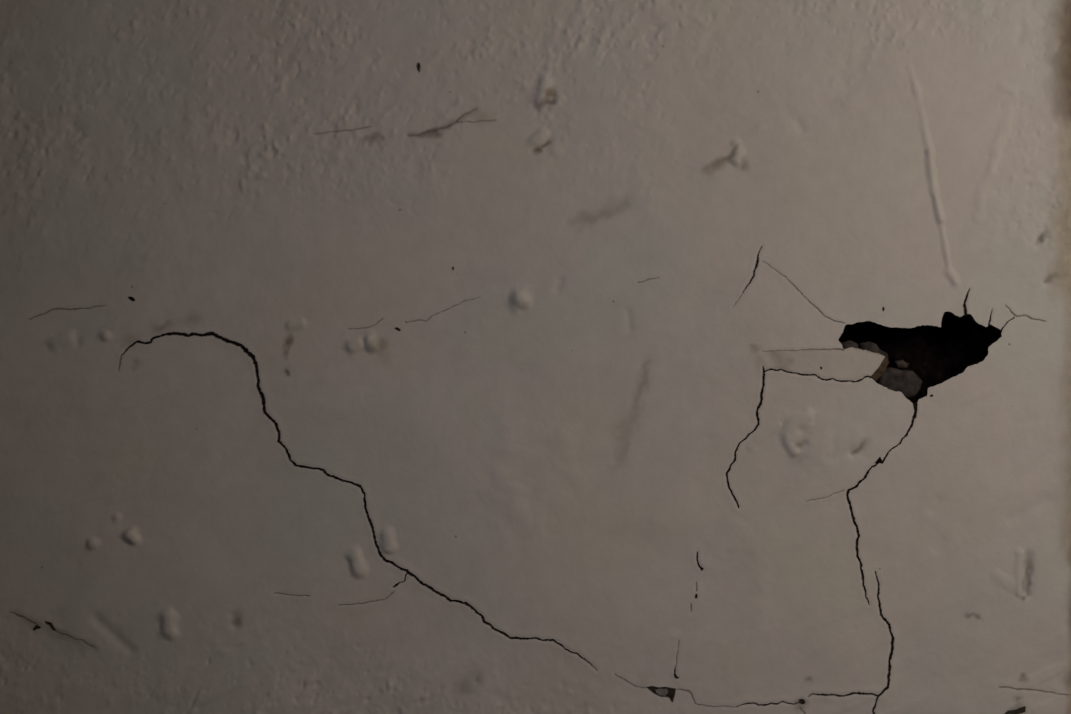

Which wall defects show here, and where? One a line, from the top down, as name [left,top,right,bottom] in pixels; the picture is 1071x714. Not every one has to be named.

crack [726,247,871,508]
flaking render [839,312,1002,403]
crack [963,289,1045,332]
crack [119,332,646,688]
crack [674,402,918,714]